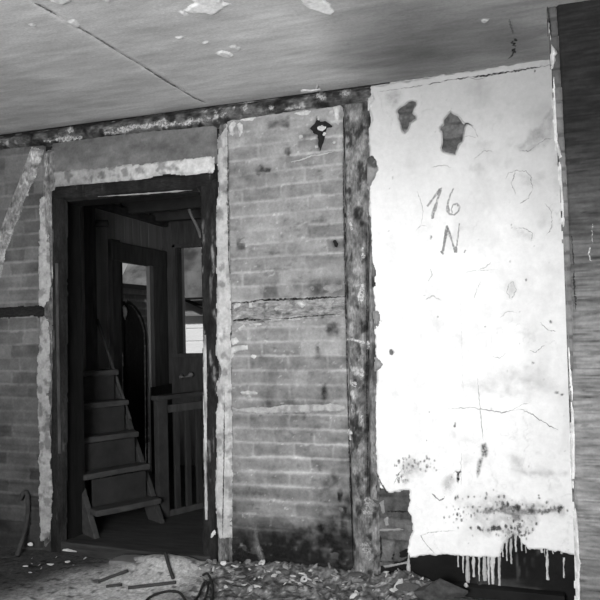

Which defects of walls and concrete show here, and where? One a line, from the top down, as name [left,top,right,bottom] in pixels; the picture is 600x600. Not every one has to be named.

peeling [177,0,231,16]
peeling [301,0,335,15]
peeling [104,117,211,134]
spalling [396,100,416,133]
spalling [439,110,475,155]
crack [232,296,346,304]
crack [233,313,340,321]
crack [452,386,558,437]
leakage [232,493,352,571]
spalling [373,488,413,568]
leakage [470,495,568,536]